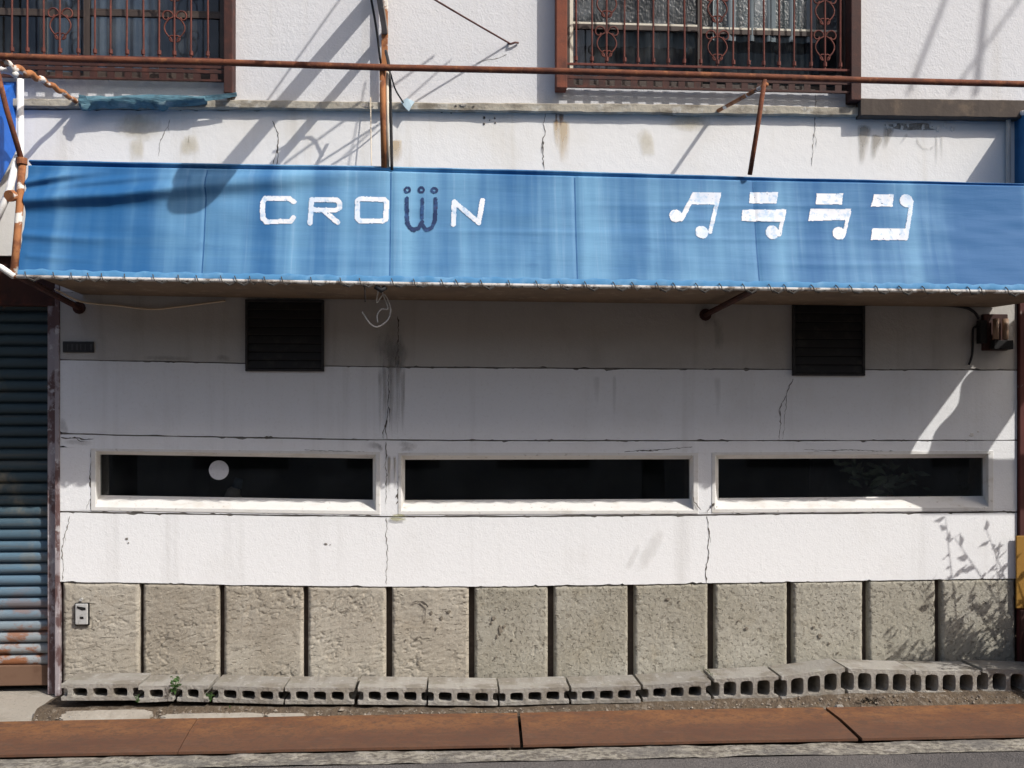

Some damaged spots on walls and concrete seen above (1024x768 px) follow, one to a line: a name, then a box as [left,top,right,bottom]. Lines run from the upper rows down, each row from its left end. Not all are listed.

crack [539,114,547,166]
crack [311,317,399,581]
crack [779,380,873,452]
crack [693,497,712,581]